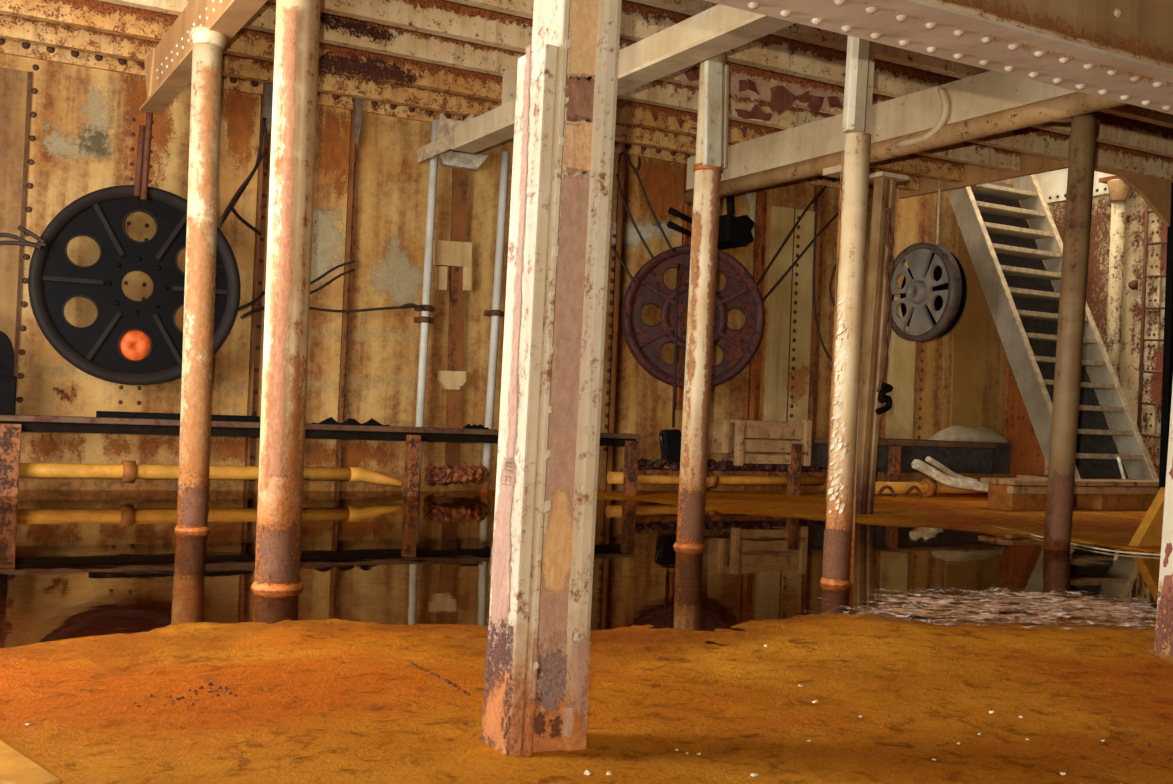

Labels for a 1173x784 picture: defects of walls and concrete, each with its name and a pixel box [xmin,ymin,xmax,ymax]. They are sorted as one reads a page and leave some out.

corrosion [318,13,425,86]
peeling [680,66,700,86]
peeling [729,72,844,137]
corrosion [102,66,258,528]
corrosion [259,5,389,496]
corrosion [1049,201,1066,242]
corrosion [1086,195,1111,348]
corrosion [527,0,599,757]
corrosion [636,158,722,545]
corrosion [1146,344,1163,411]
peeling [1158,543,1173,614]
corrosion [1154,579,1173,656]